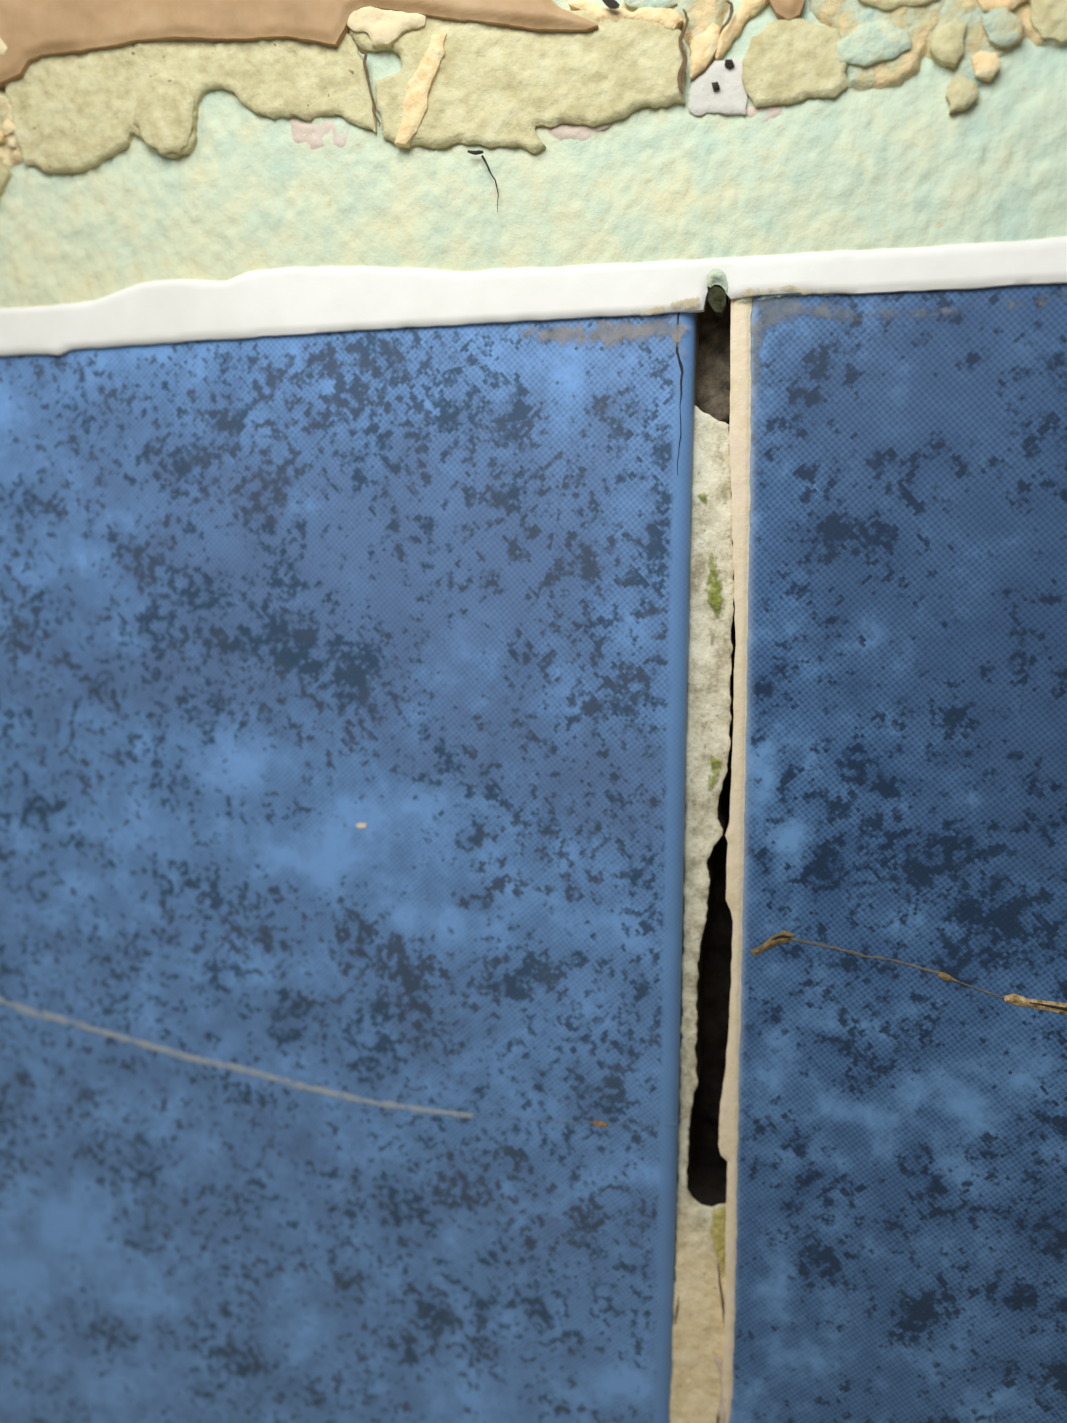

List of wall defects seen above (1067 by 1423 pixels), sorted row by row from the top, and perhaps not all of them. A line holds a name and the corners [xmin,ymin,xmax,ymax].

flaking render [0,0,1067,202]
crack [675,312,683,475]
crack [750,930,1067,1015]
crack [0,998,676,1127]